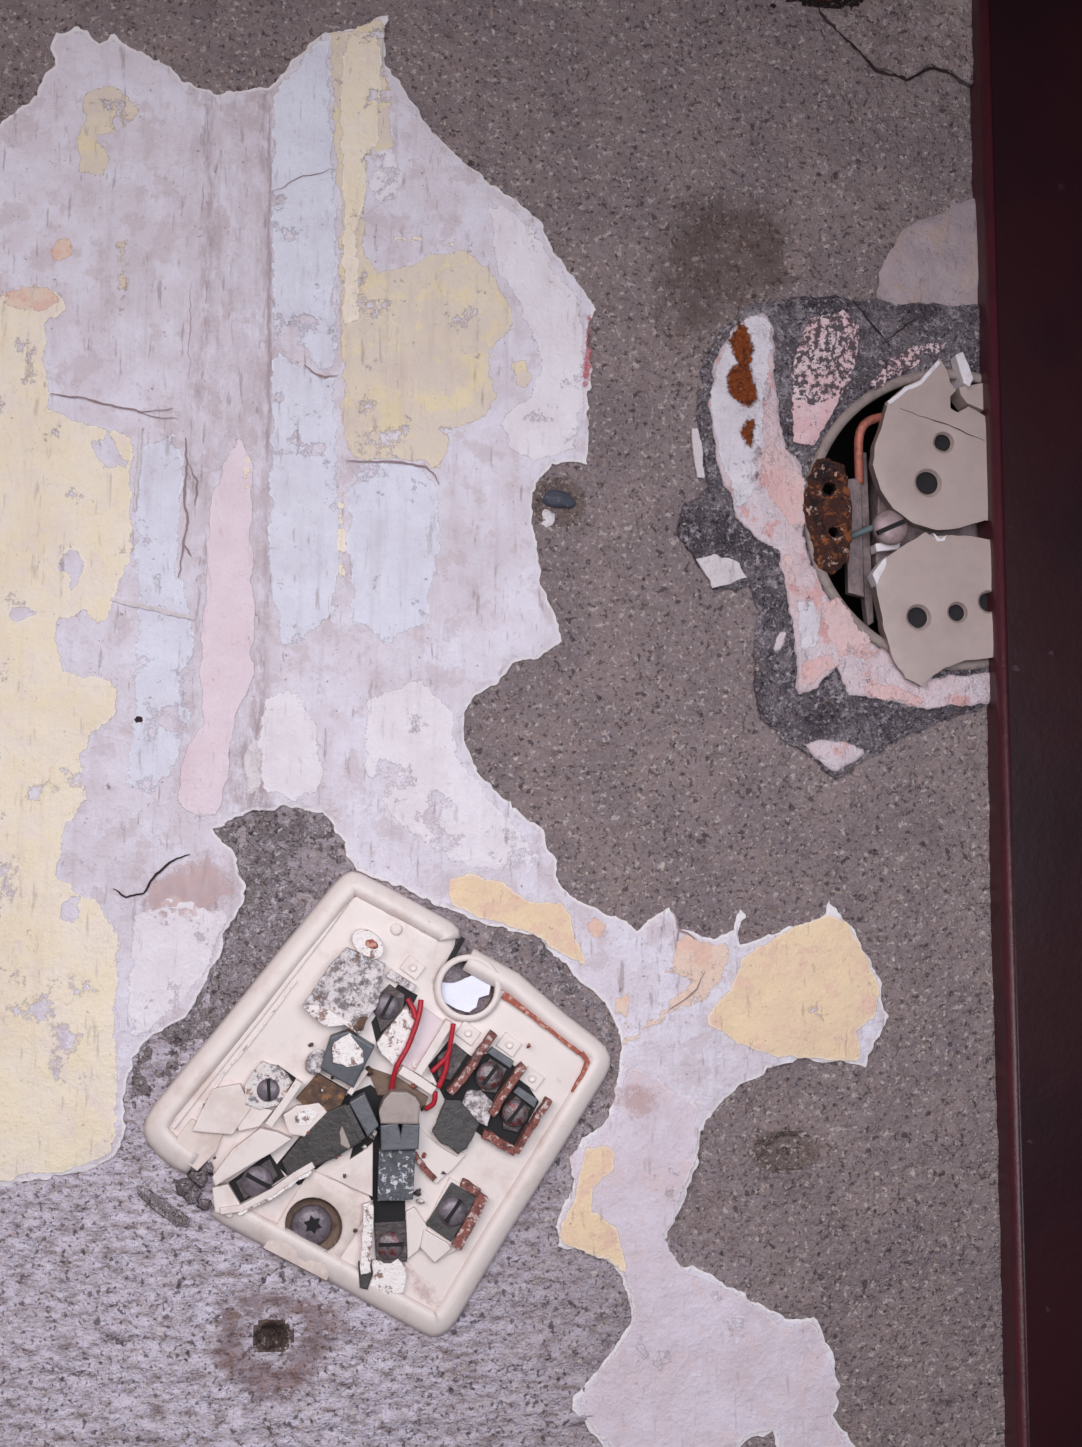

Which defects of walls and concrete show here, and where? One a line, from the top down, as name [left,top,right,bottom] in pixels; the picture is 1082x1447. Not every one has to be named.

flaking render [769,0,973,85]
crack [818,8,970,88]
rust [727,322,758,448]
spalling [676,198,990,780]
peeling [61,896,81,922]
crack [114,854,190,898]
flaking render [151,810,334,1082]
peeling [844,954,889,1068]
peeling [559,1145,627,1272]
peeling [662,1156,699,1240]
peeling [572,1259,635,1416]
peeling [678,1263,835,1373]